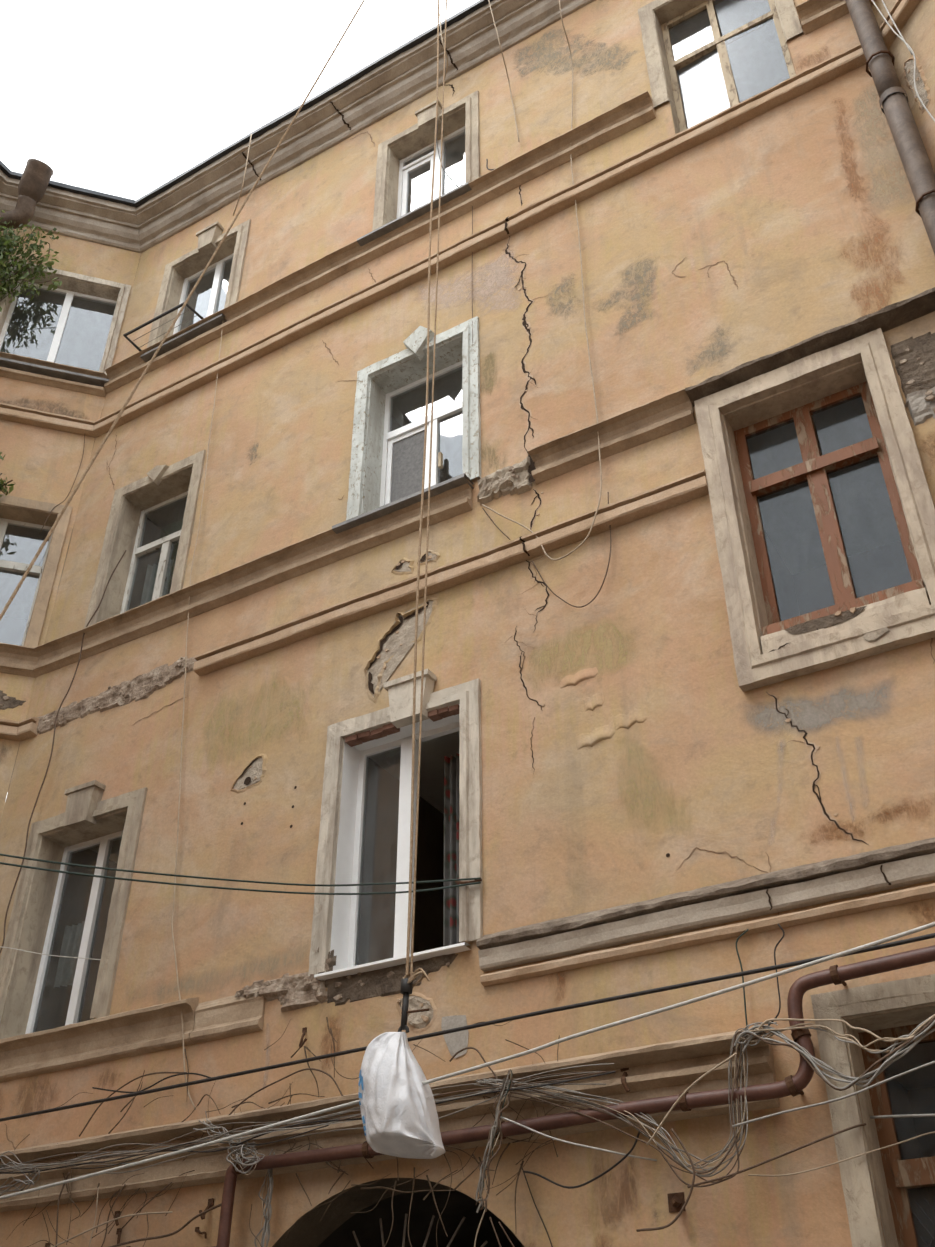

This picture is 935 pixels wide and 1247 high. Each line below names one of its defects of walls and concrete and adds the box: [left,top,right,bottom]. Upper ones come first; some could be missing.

leakage [517,29,628,74]
leakage [605,261,655,331]
crack [672,258,738,289]
spalling [891,331,935,401]
crack [502,185,551,776]
spalling [364,597,438,704]
spalling [0,690,26,710]
leakage [753,686,887,730]
spalling [230,754,268,794]
crack [766,692,891,885]
crack [680,847,779,915]
spalling [306,947,458,1033]